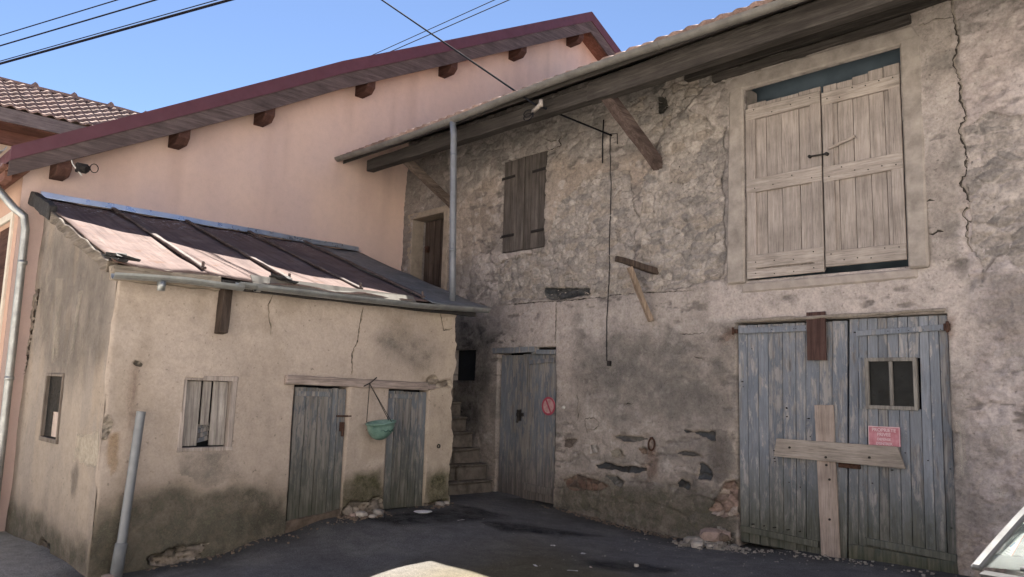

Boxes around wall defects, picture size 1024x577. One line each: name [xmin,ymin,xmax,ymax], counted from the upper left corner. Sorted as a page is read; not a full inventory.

crack [919,0,985,252]
crack [351,308,364,374]
damp [5,488,286,575]
flaking render [148,543,209,566]